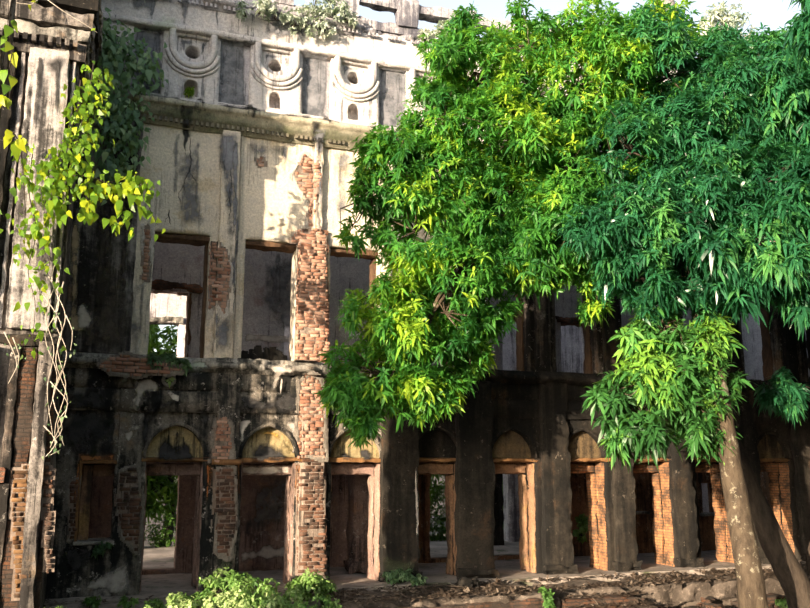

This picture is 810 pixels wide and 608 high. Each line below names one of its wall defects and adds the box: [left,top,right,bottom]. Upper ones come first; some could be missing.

leakage [85,178,141,351]
leakage [136,28,200,221]
crack [165,139,198,224]
flaking render [206,240,233,320]
leakage [212,135,238,351]
flaking render [246,151,330,393]
flaking render [8,464,31,601]
flaking render [113,464,145,555]
flaking render [96,351,185,406]
leakage [158,432,193,460]
leakage [253,444,284,460]
flaking render [208,371,329,576]